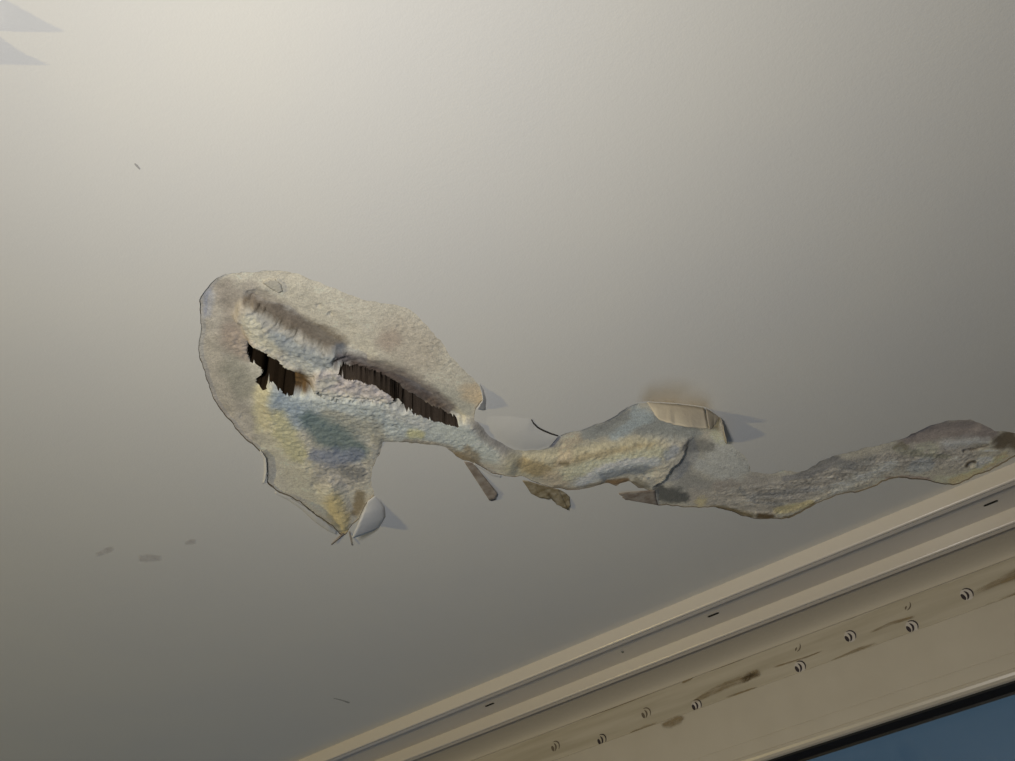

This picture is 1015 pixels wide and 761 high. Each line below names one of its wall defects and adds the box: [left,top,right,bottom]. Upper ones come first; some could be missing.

flaking render [199,270,1015,545]